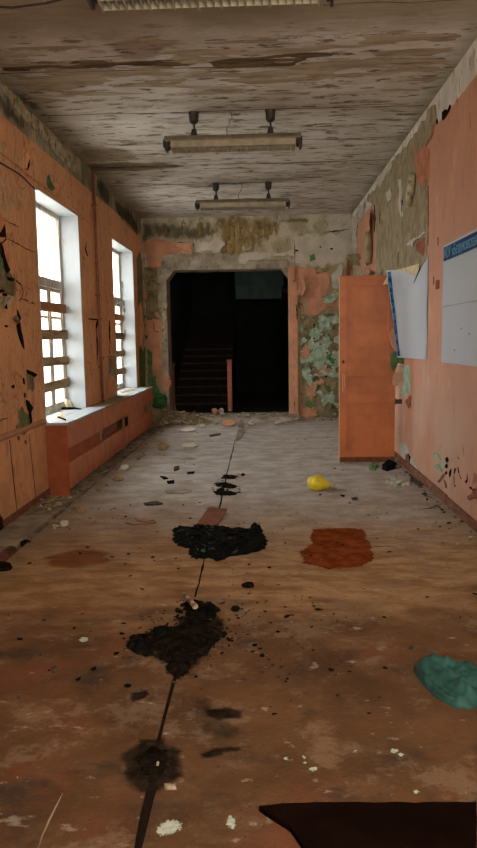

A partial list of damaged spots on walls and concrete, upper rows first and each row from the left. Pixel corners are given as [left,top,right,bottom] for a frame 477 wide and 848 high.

spalling [0,217,25,350]
crack [2,220,36,253]
peeling [137,104,451,418]
spalling [11,362,38,444]
peeling [432,445,477,500]